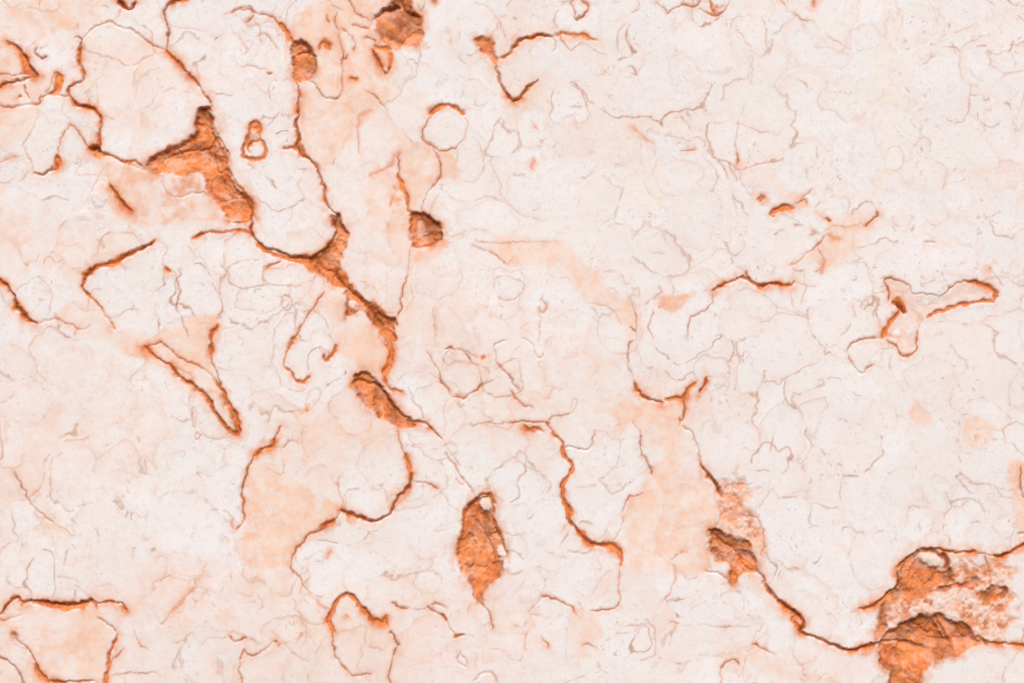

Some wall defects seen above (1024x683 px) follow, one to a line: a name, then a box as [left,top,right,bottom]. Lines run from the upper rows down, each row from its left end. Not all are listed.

spalling [363,0,431,53]
crack [935,0,1024,81]
spalling [137,96,268,232]
crack [470,0,901,343]
crack [976,112,1000,129]
crack [0,0,472,569]
spalling [874,269,1003,366]
crack [0,250,910,683]
spalling [448,482,513,604]
spalling [696,473,770,593]
crack [939,460,1024,580]
spalling [864,534,1024,683]